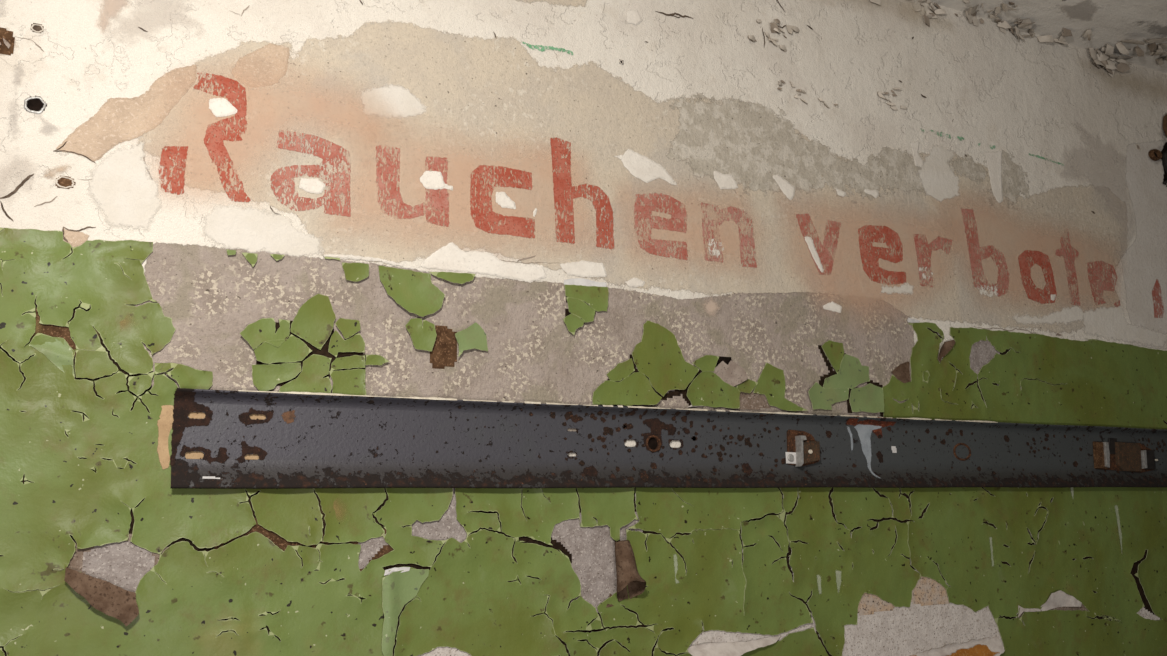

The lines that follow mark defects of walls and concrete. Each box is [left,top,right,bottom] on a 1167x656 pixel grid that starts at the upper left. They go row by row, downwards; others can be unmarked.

crack [0,174,57,412]
peeling [56,19,1128,470]
crack [65,301,153,473]
rust [170,389,267,466]
rust [239,408,296,426]
rust [549,409,786,484]
rust [846,416,973,463]
crack [470,491,681,656]
peeling [510,512,646,613]
crack [634,488,832,656]
peeling [681,617,816,656]
peeling [842,570,1005,656]